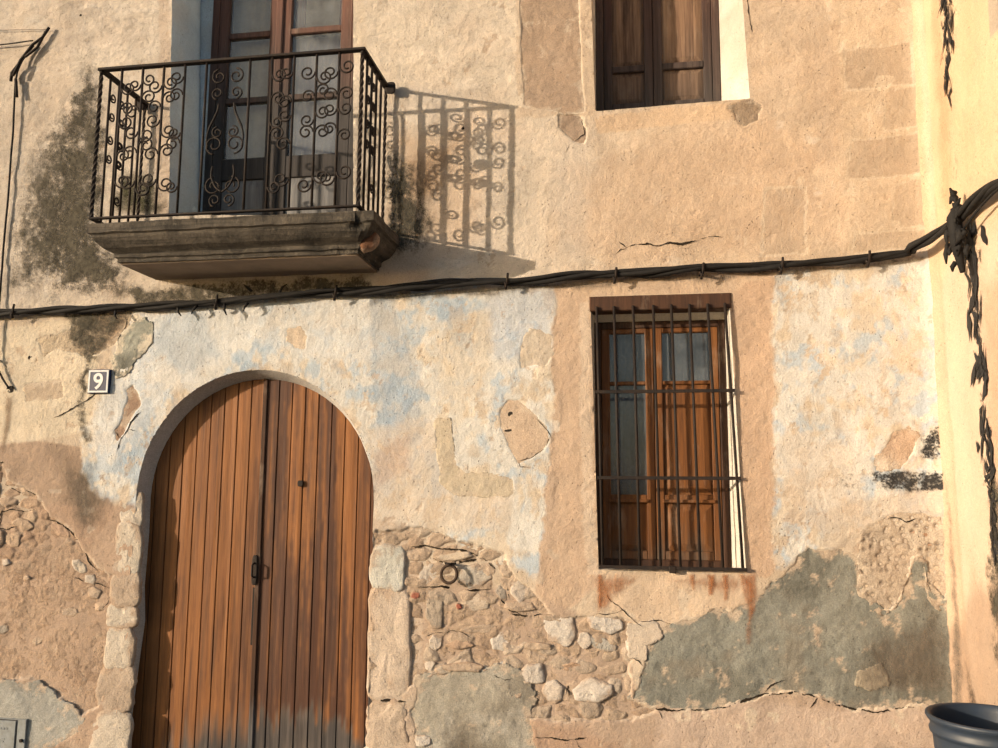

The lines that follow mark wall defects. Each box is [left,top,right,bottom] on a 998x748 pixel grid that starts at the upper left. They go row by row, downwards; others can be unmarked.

flaking render [727,98,762,126]
water stain [10,67,372,303]
crack [617,236,719,253]
water stain [64,311,123,442]
flaking render [500,400,551,467]
water stain [987,478,998,623]
corrosion [598,576,622,607]
corrosion [707,575,727,599]
corrosion [741,576,755,616]
peeling [626,512,952,712]
peeling [410,662,538,748]
crack [637,680,914,719]